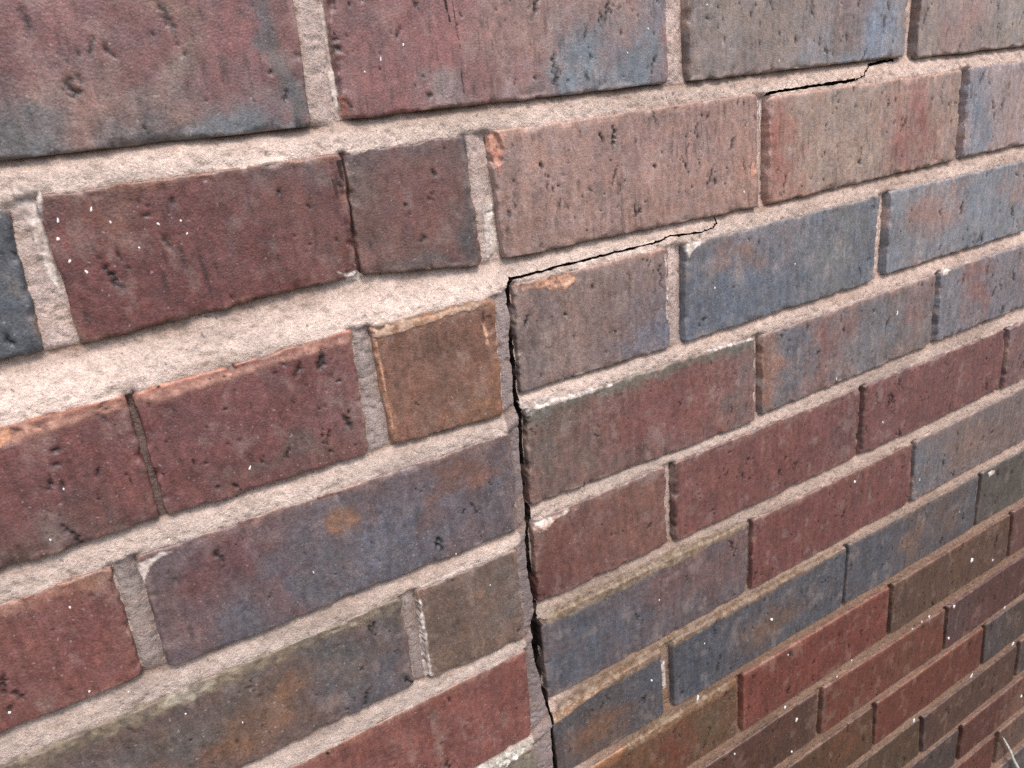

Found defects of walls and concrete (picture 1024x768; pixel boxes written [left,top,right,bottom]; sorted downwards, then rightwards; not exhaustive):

crack [764,60,887,96]
crack [505,217,716,303]
crack [508,329,557,768]